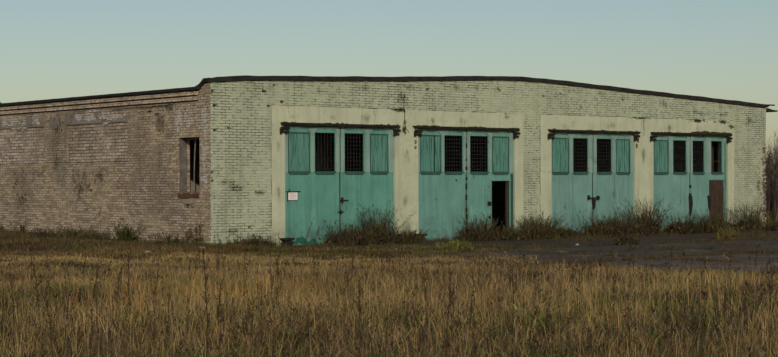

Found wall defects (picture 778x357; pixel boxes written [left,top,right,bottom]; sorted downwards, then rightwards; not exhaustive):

peeling [0,110,126,132]